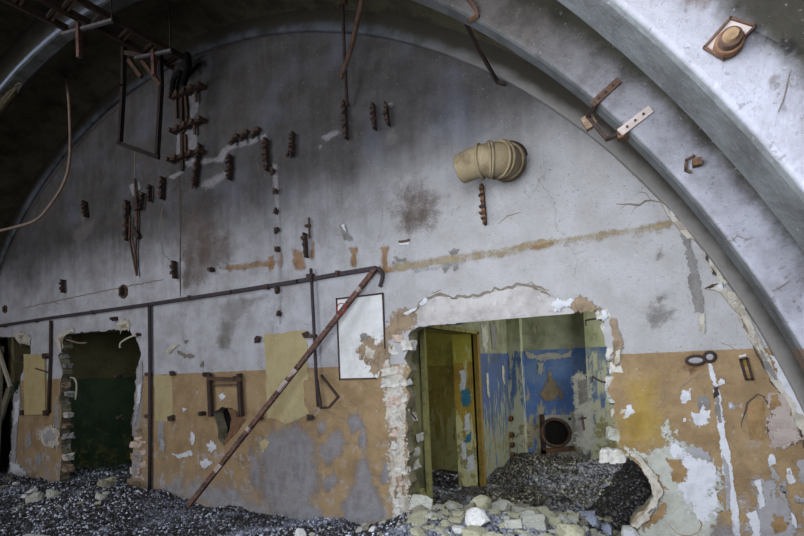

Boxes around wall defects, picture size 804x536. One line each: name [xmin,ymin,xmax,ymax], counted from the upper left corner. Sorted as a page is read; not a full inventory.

crack [616,192,660,211]
rust [635,221,671,233]
rust [225,253,283,270]
rust [293,243,314,270]
rust [379,230,623,274]
peeling [480,321,497,353]
peeling [525,203,804,536]
spalling [127,360,147,487]
spalling [219,393,233,435]
spalling [356,297,427,518]
peeling [459,370,475,473]
peeling [159,431,217,469]